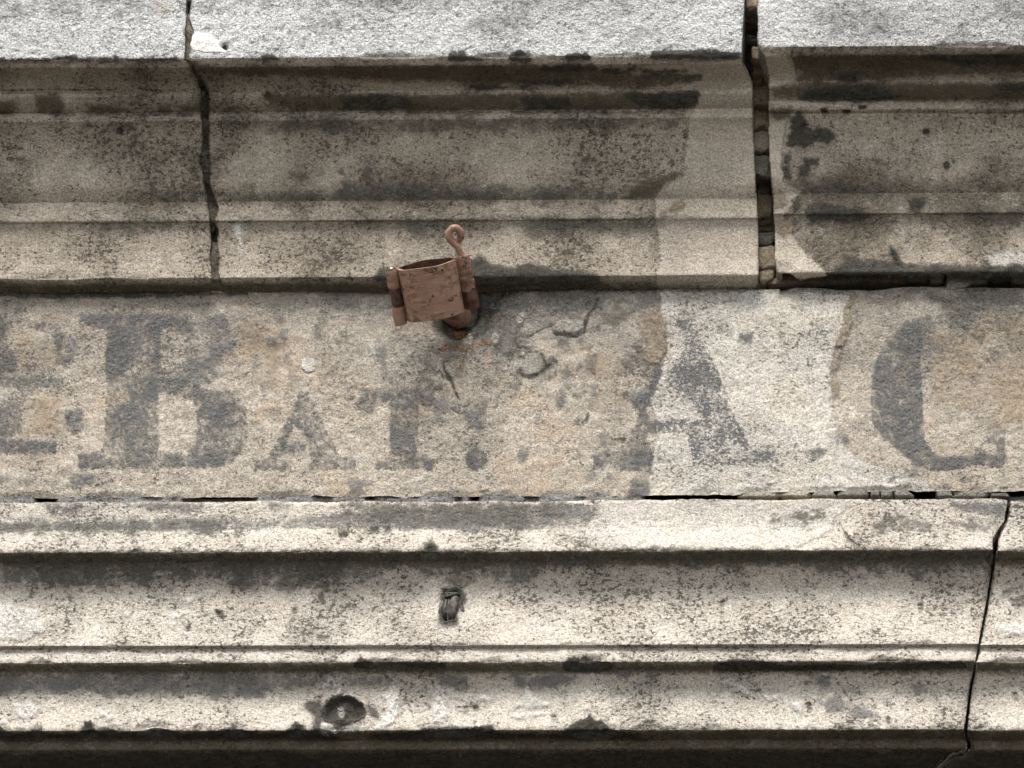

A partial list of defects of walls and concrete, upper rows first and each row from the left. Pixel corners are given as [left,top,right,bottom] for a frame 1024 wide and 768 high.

damp [0,48,1024,570]
crack [514,299,599,340]
crack [424,350,464,398]
crack [987,545,998,593]
crack [963,675,975,751]